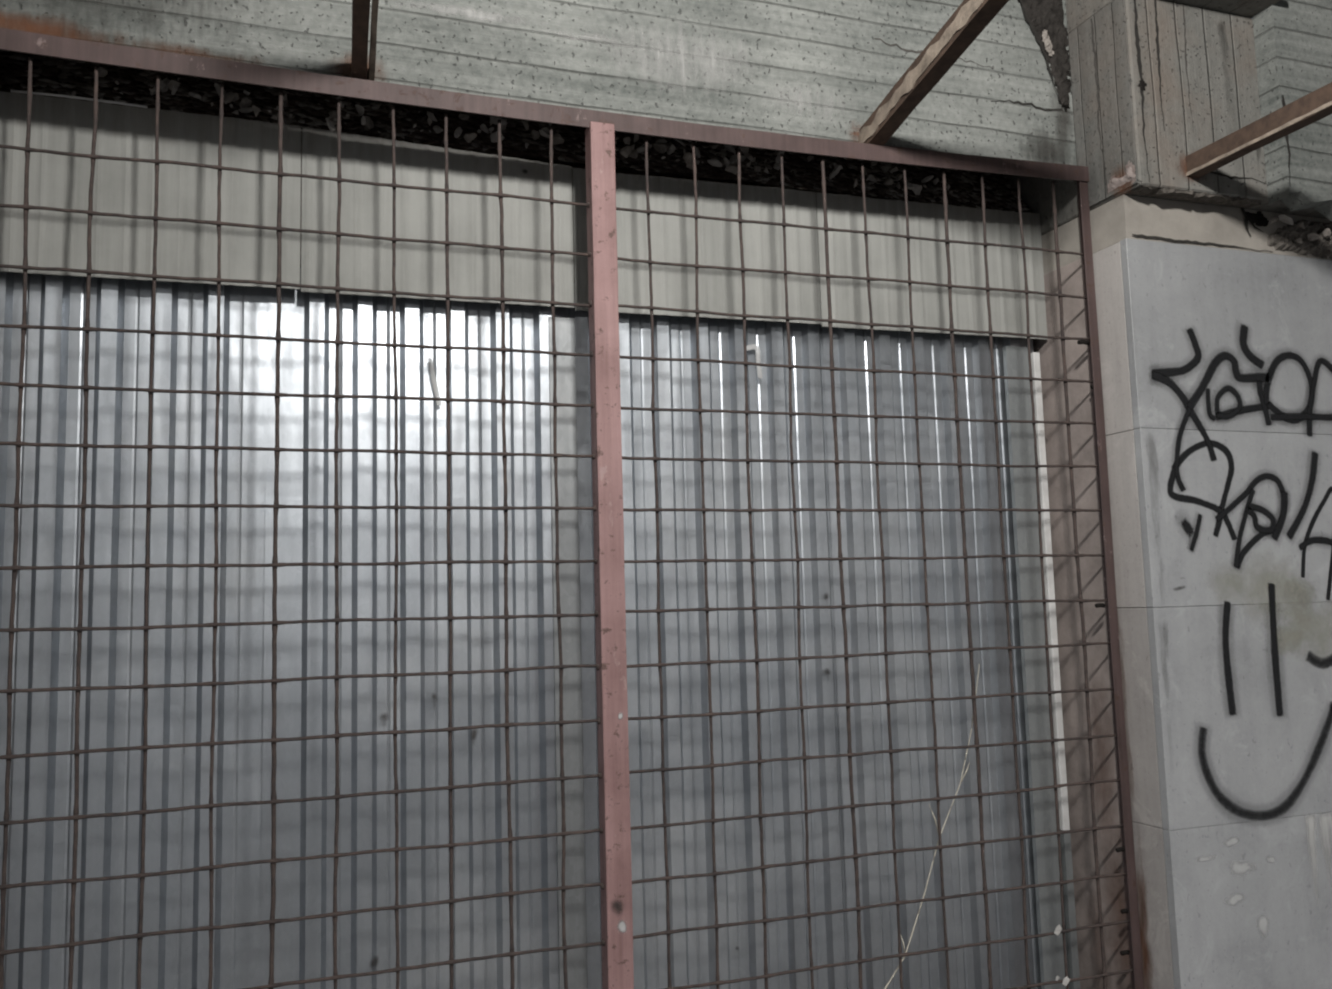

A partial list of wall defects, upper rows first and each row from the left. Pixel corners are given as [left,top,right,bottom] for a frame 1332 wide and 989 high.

spalling [991,0,1071,111]
crack [1091,18,1108,194]
crack [1134,0,1193,183]
crack [1132,95,1291,252]
flaking render [1107,160,1332,260]